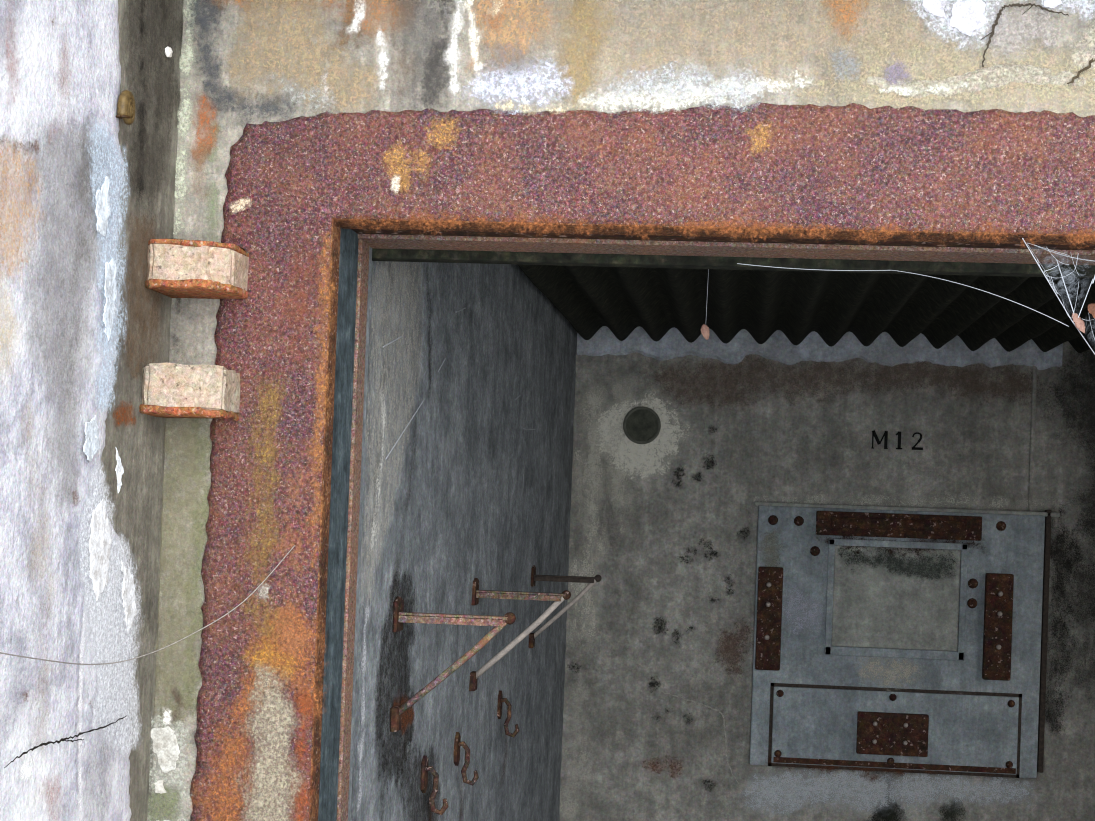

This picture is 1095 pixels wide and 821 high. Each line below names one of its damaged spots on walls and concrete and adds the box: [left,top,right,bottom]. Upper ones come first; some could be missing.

water stain [350,5,365,31]
corrosion [469,0,555,70]
water stain [377,0,1095,117]
crack [981,3,1069,67]
crack [1067,58,1095,84]
corrosion [384,147,430,191]
water stain [0,0,333,495]
corrosion [201,380,321,821]
water stain [361,571,441,821]
crack [4,716,126,768]
peeling [244,667,302,821]
corrosion [769,757,1016,780]